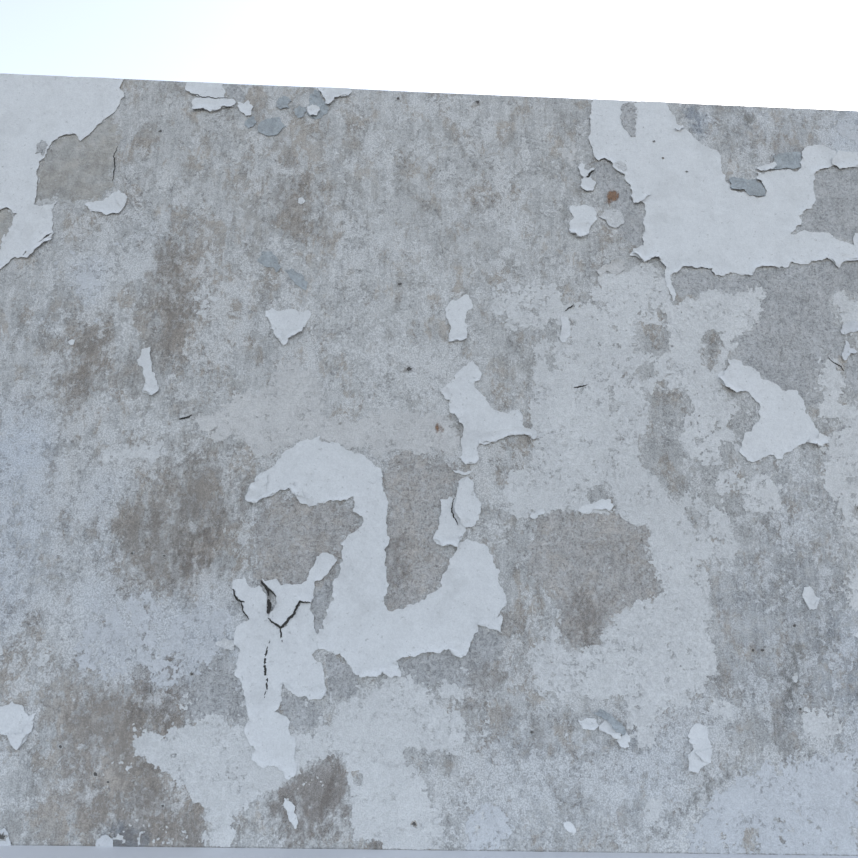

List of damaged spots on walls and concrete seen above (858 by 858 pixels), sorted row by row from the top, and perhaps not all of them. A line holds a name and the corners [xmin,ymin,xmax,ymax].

peeling [185,82,352,136]
peeling [0,73,128,269]
peeling [137,347,159,395]
peeling [101,430,177,469]
peeling [191,99,858,856]
crack [232,581,311,698]
peeling [0,701,36,750]
peeling [73,589,292,847]